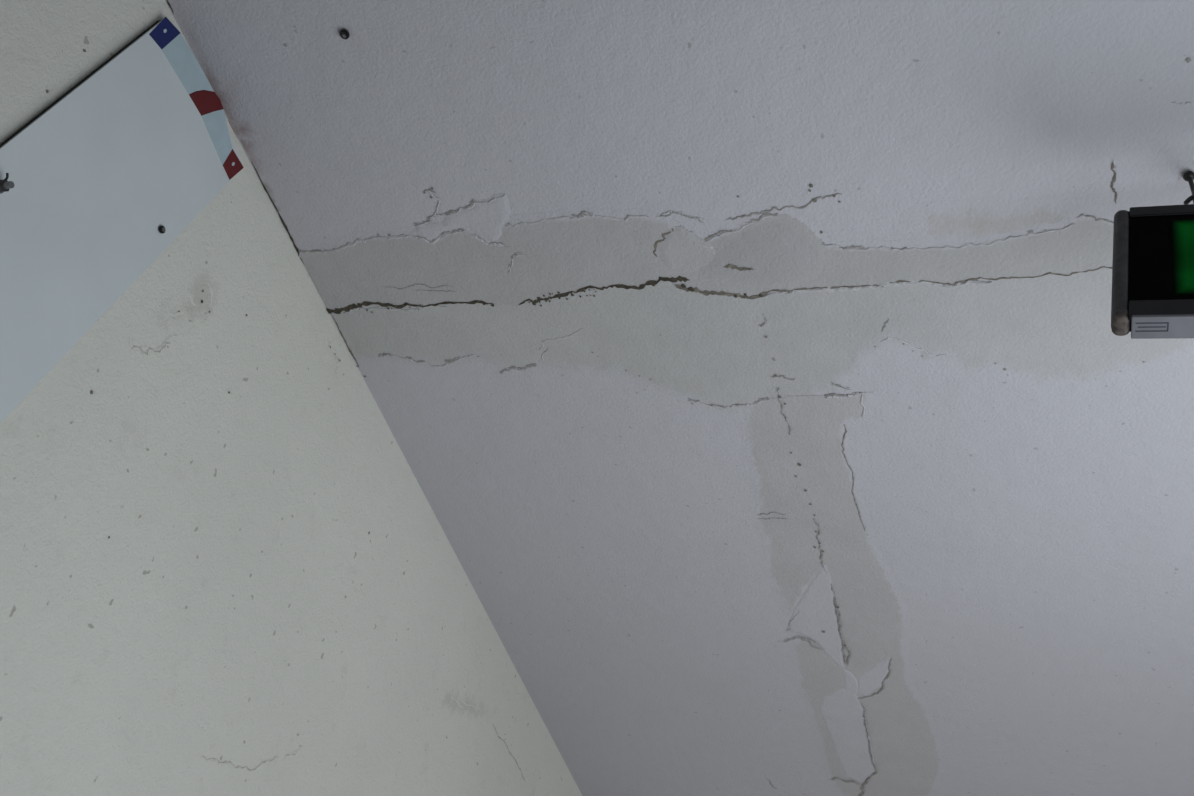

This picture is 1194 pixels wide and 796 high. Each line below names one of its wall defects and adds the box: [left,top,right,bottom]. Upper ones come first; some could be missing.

crack [657,184,841,234]
peeling [298,190,1114,796]
crack [326,266,1112,664]
crack [832,703,877,796]